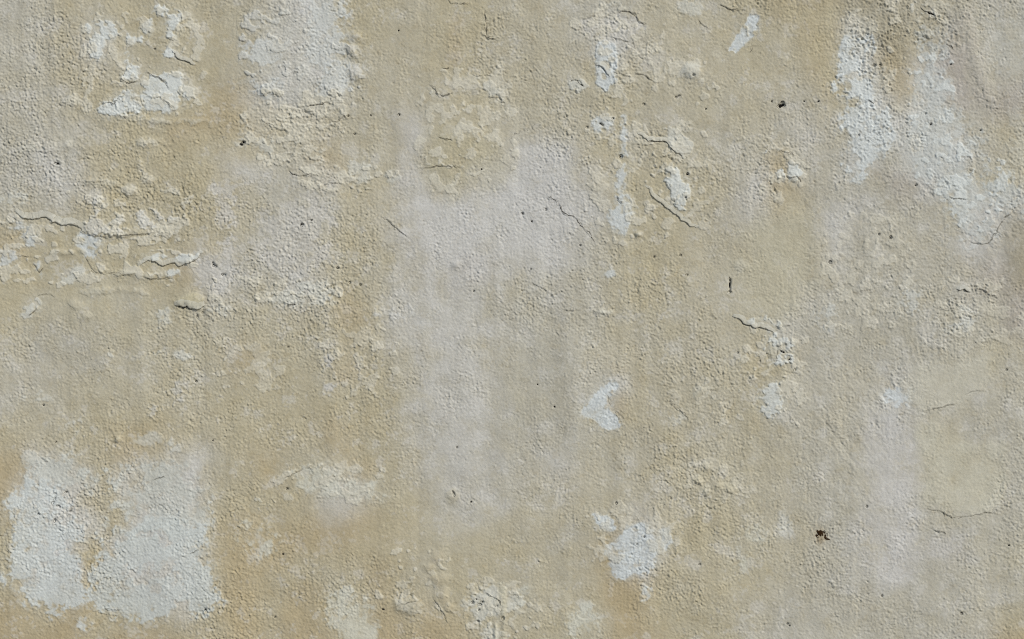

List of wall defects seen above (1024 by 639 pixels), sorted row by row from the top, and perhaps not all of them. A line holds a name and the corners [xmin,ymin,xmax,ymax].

peeling [724,9,764,58]
peeling [562,0,715,248]
peeling [825,0,1024,257]
crack [15,208,87,233]
crack [645,185,699,228]
crack [137,250,203,266]
peeling [0,0,403,638]
peeling [573,375,626,437]
peeling [585,496,682,605]